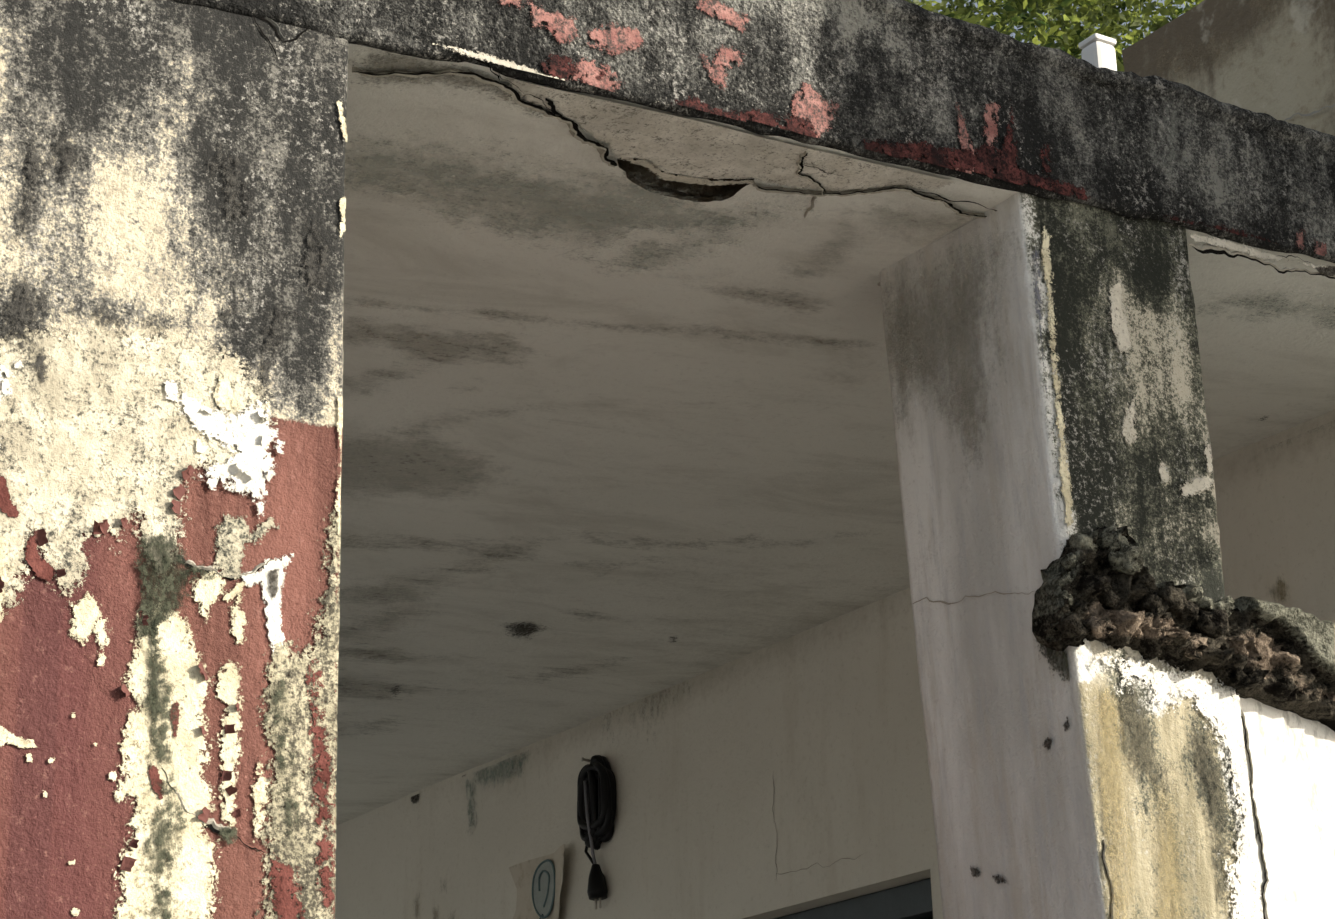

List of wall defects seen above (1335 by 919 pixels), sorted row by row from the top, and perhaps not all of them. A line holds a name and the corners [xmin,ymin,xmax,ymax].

crack [352,56,617,167]
crack [752,151,997,218]